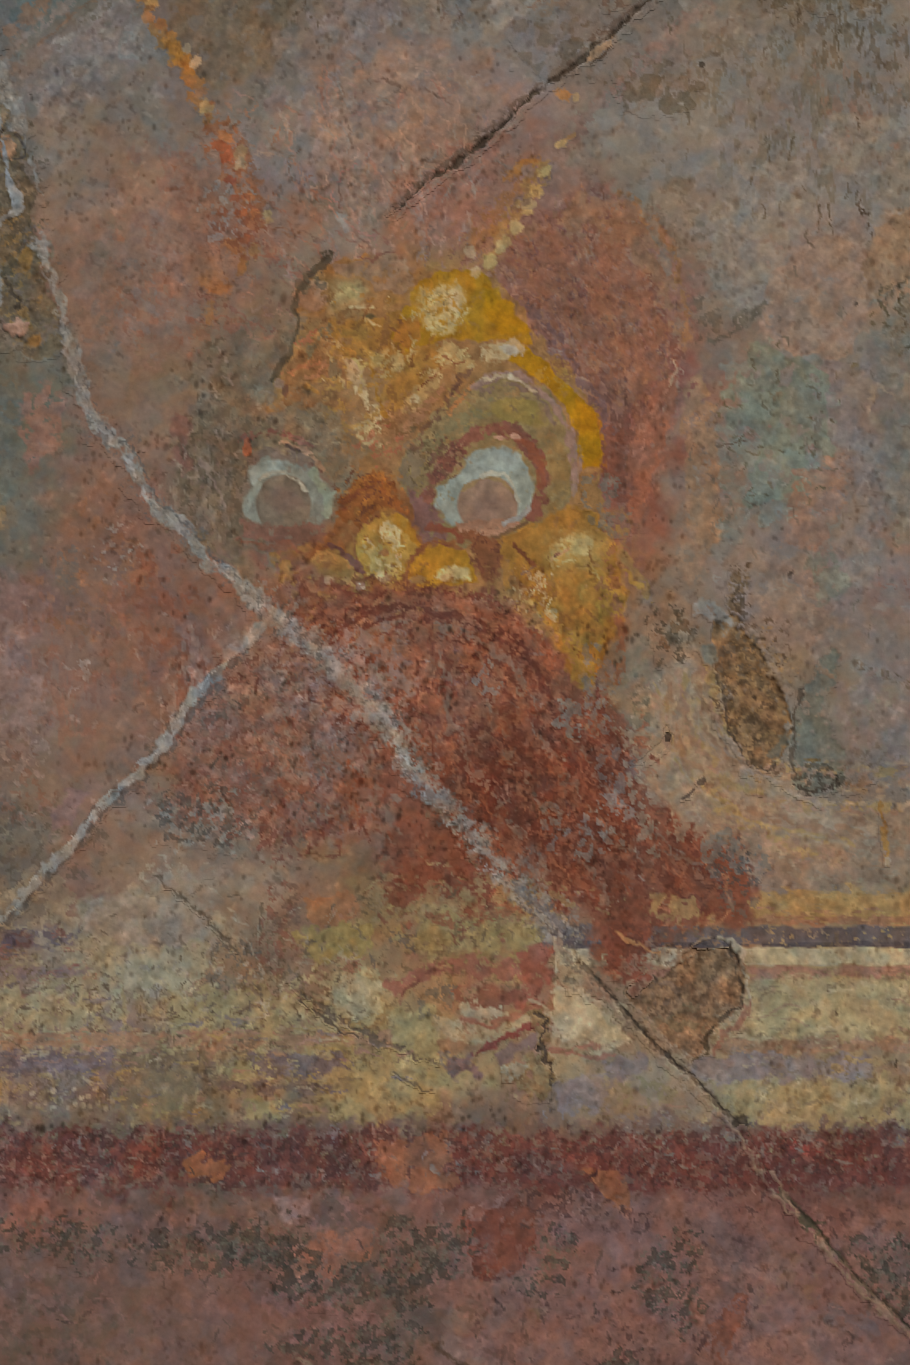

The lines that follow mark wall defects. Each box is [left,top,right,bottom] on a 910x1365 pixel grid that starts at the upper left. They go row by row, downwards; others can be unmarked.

crack [0,21,45,229]
crack [384,0,664,222]
crack [0,255,8,307]
crack [0,613,276,934]
crack [632,724,675,767]
crack [680,775,707,802]
flaking render [644,563,884,810]
crack [150,873,239,954]
crack [280,977,440,1095]
flaking render [622,933,758,1066]